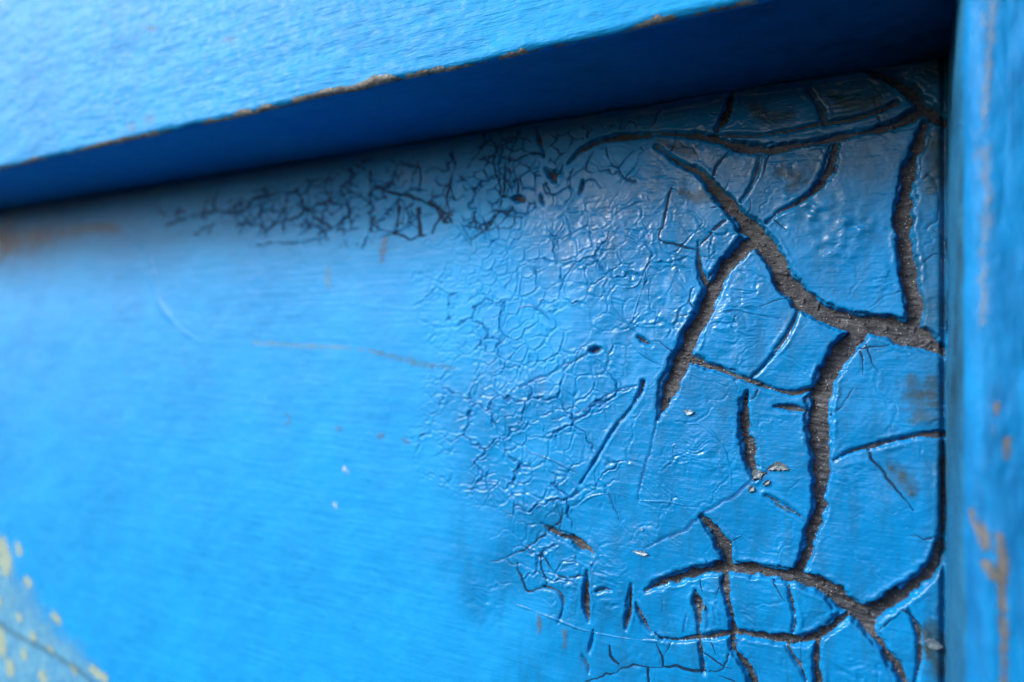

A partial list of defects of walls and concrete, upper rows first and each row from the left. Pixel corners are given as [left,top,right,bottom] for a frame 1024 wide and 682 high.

peeling [623,0,759,34]
peeling [197,47,541,125]
peeling [0,129,179,169]
crack [151,70,948,682]